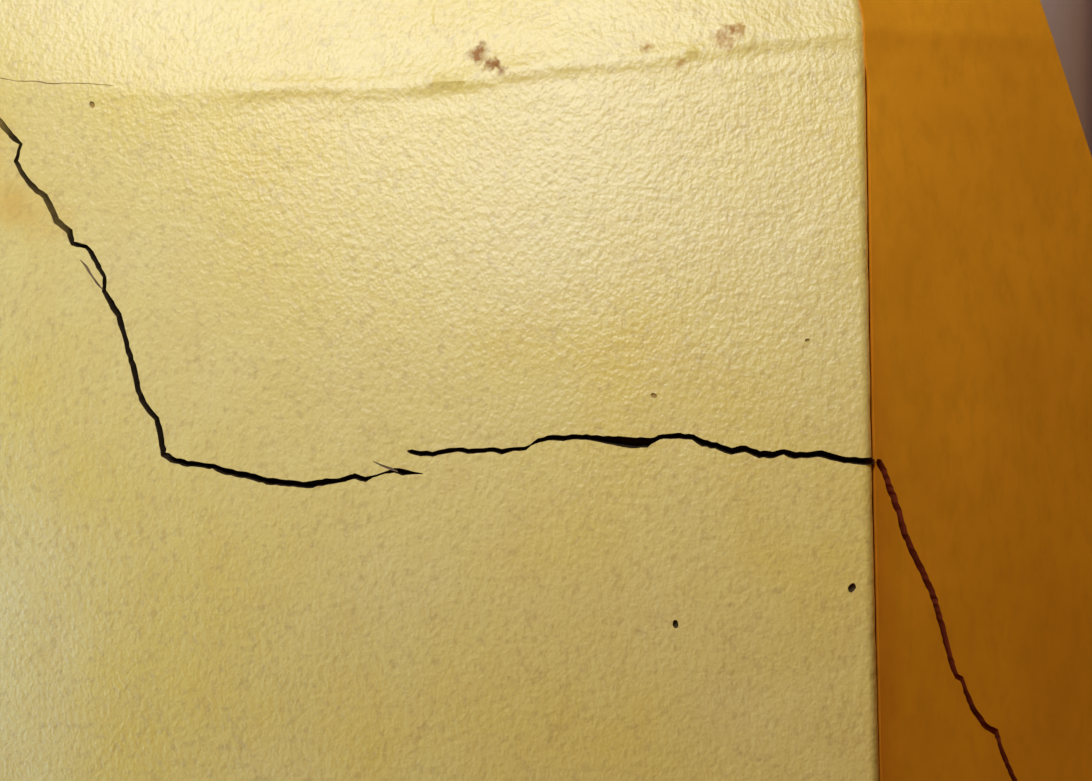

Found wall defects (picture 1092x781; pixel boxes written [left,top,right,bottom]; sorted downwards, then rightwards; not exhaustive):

crack [0,78,114,86]
crack [863,76,871,286]
crack [0,118,1018,781]